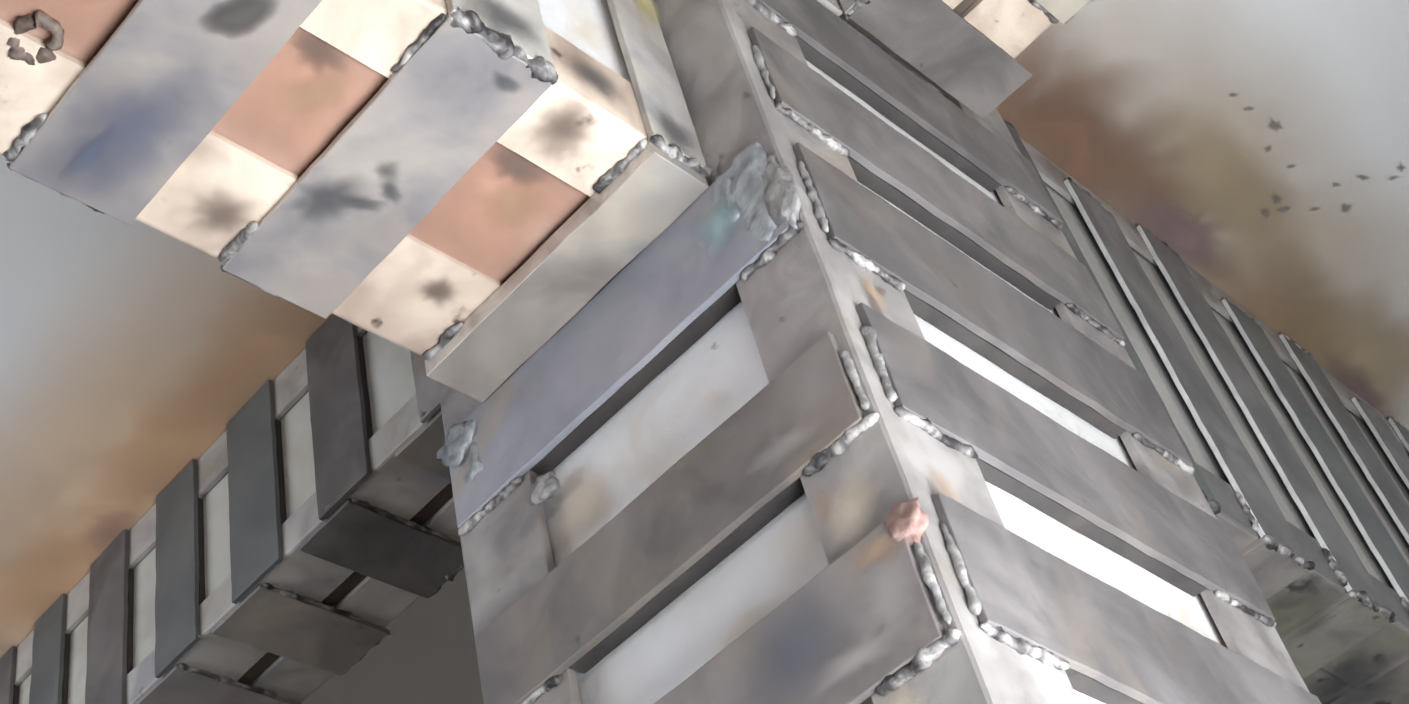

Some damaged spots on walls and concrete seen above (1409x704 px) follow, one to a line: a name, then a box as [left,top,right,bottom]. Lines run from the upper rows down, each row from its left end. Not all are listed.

water stain [996,49,1409,407]
water stain [0,322,312,659]